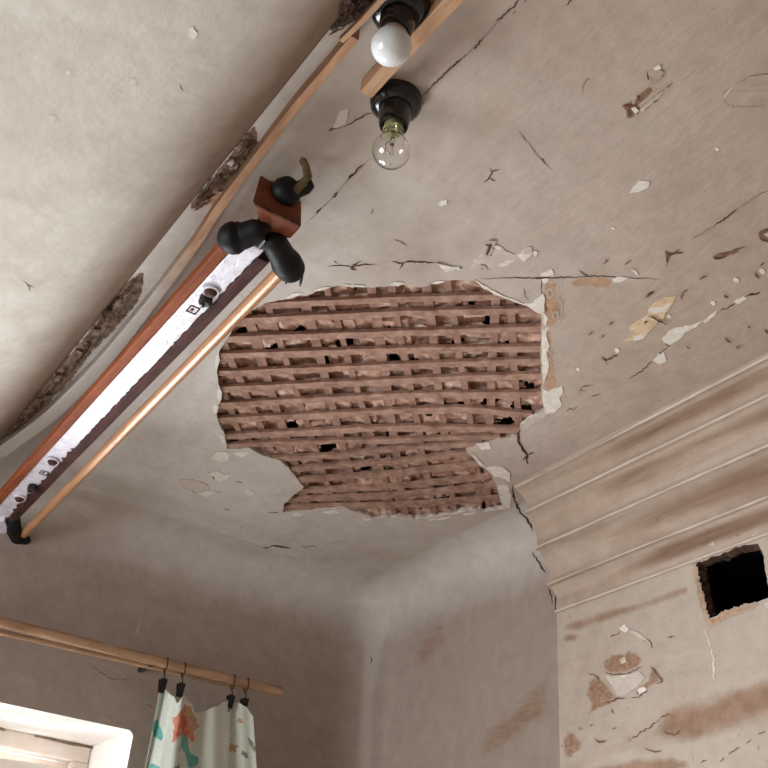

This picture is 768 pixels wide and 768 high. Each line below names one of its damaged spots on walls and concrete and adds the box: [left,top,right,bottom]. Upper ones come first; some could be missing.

crack [422,0,526,97]
spalling [191,127,258,211]
crack [334,261,372,270]
crack [391,239,463,273]
crack [483,270,656,299]
spalling [0,273,144,441]
peeling [475,280,563,432]
peeling [630,292,760,379]
crack [517,429,532,464]
crack [512,485,533,530]
spalling [691,555,768,628]
spalling [560,648,663,762]